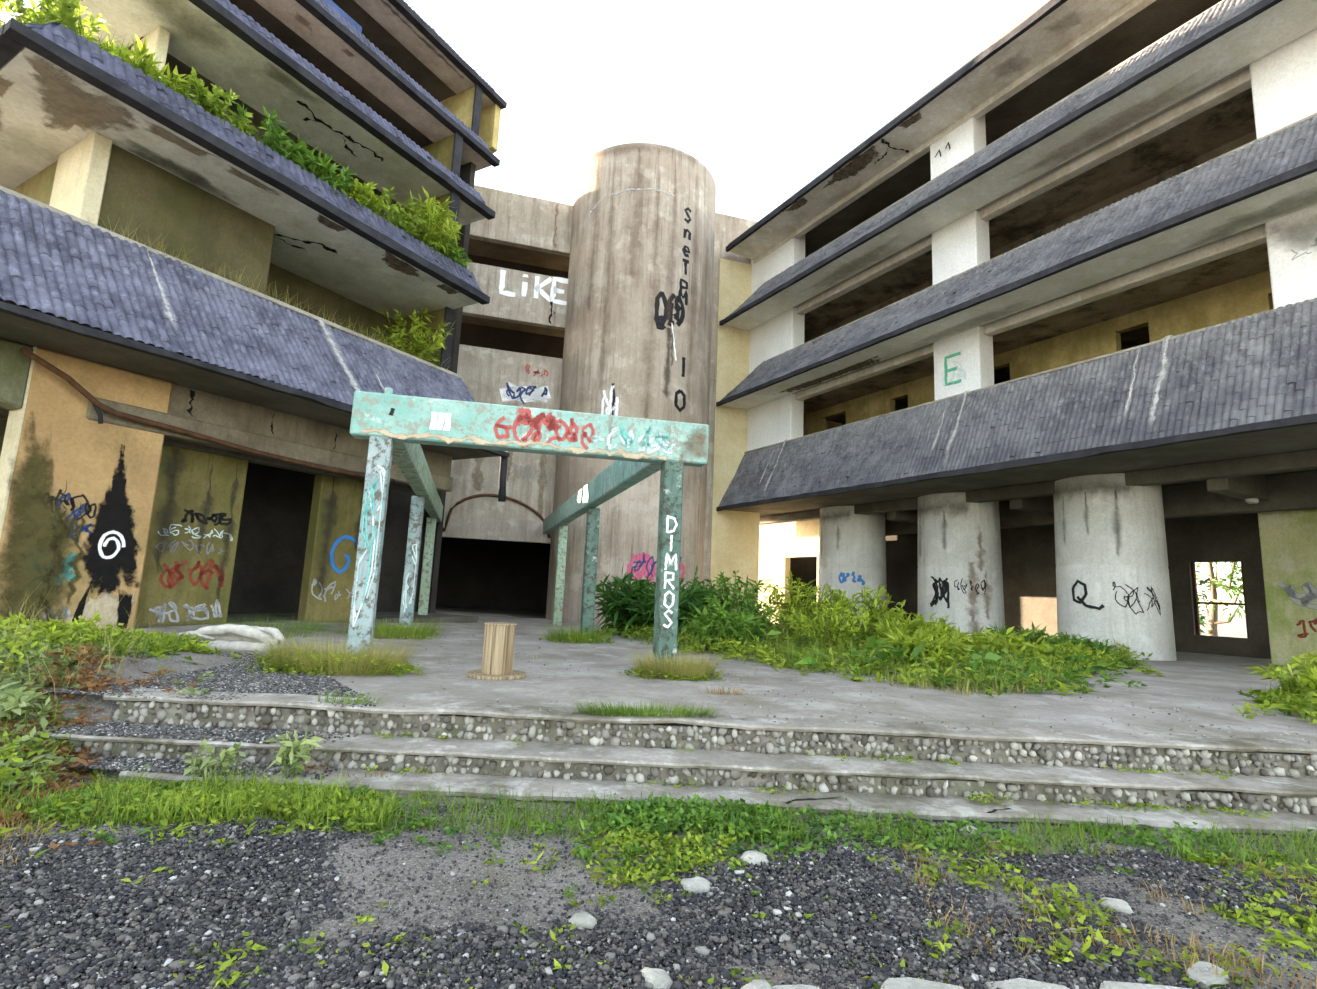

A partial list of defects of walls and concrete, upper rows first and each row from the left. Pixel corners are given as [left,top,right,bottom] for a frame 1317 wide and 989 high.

crack [296,100,383,161]
spalling [899,111,921,129]
spalling [824,146,878,188]
spalling [783,198,808,212]
crack [274,234,338,254]
peeling [360,428,667,460]
leakage [0,421,91,624]